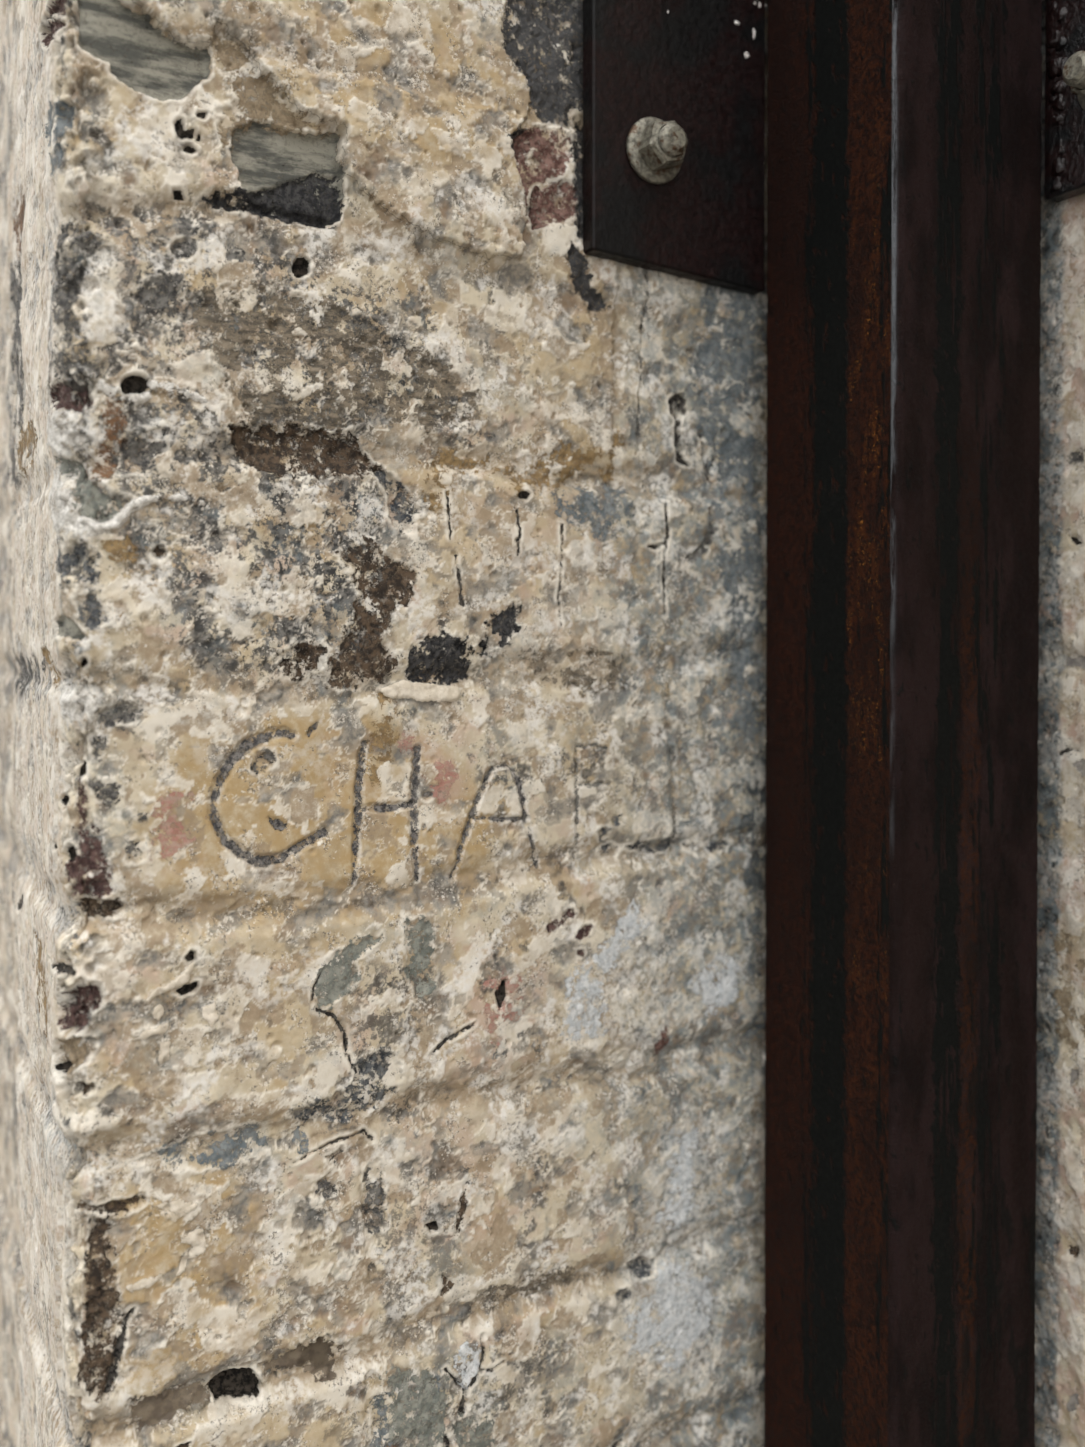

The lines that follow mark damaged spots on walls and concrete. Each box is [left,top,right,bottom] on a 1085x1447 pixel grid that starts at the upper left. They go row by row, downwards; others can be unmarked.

spalling [41,0,346,216]
flaking render [513,125,577,230]
crack [312,969,357,1074]
crack [433,1023,474,1053]
crack [293,1129,373,1163]
spalling [75,1194,146,1404]